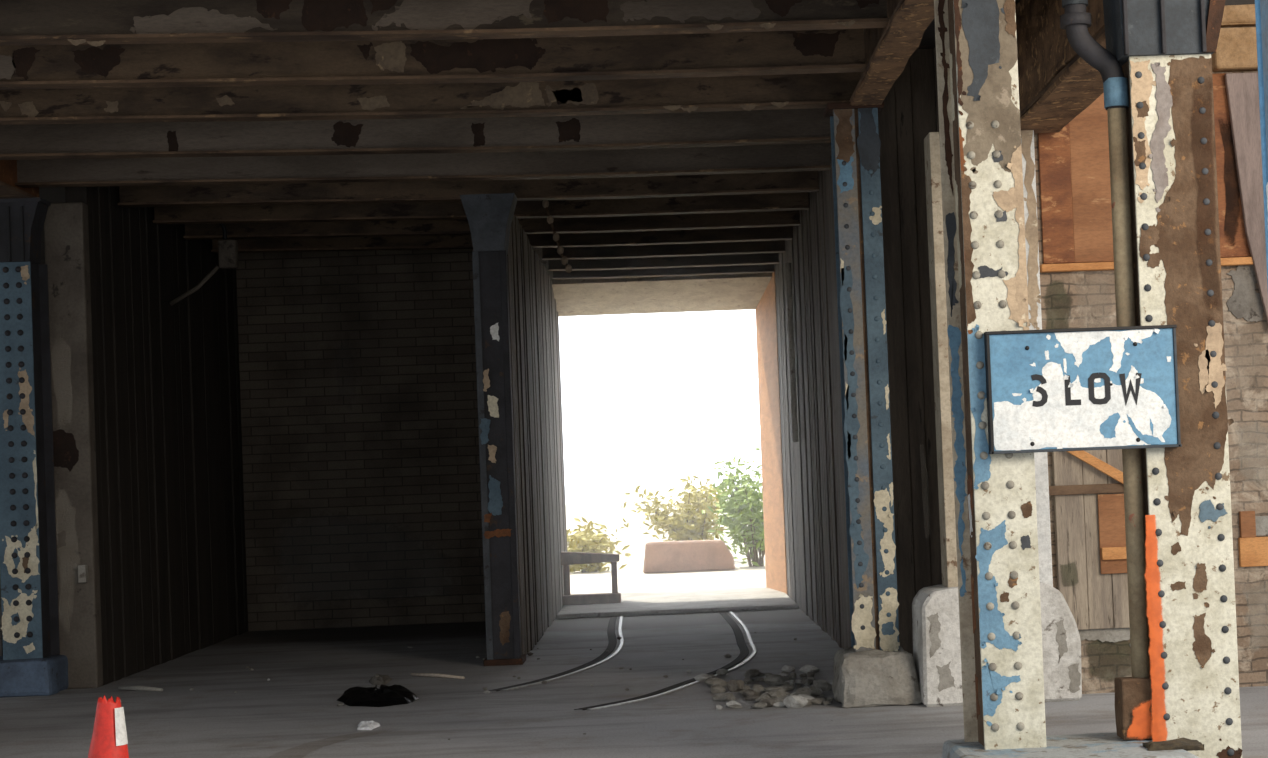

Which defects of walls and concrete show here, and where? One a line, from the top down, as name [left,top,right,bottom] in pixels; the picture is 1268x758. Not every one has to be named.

peeling [130,7,277,34]
peeling [370,0,532,73]
peeling [949,0,1041,330]
corrosion [1135,101,1149,118]
peeling [1129,60,1173,212]
peeling [490,323,500,341]
corrosion [1139,56,1240,555]
peeling [1,368,40,654]
peeling [479,368,503,516]
peeling [840,258,900,651]
peeling [945,180,1022,726]
spalling [927,612,955,692]